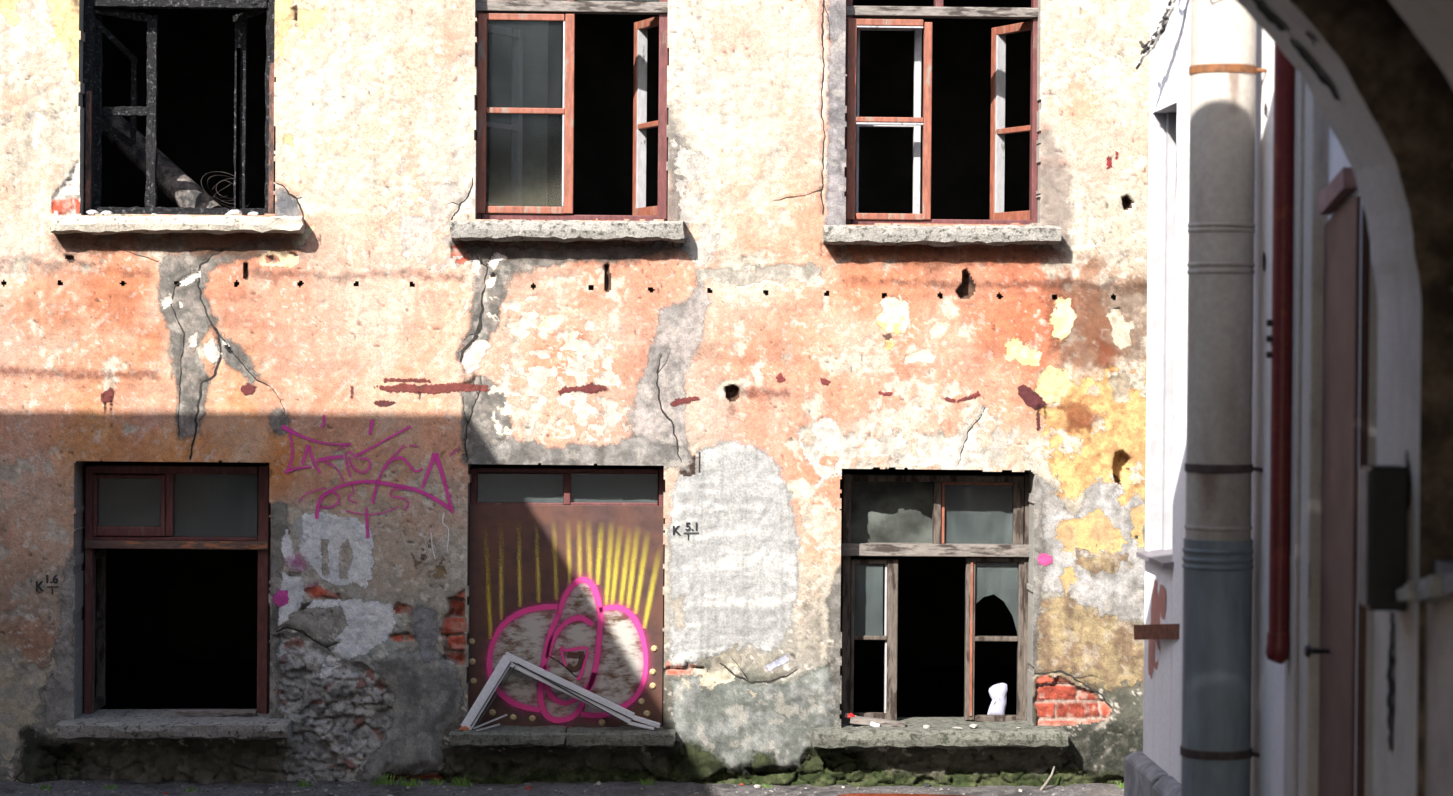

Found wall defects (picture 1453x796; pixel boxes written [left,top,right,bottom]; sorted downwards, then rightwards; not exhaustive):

peeling [45,0,81,85]
crack [448,178,473,220]
spalling [1122,196,1134,210]
crack [115,247,285,460]
crack [460,254,496,463]
peeling [371,164,632,445]
peeling [876,294,949,365]
peeling [1049,297,1077,341]
crack [656,352,682,462]
peeling [796,309,1166,726]
flaking render [304,584,342,600]
flaking render [439,588,467,665]